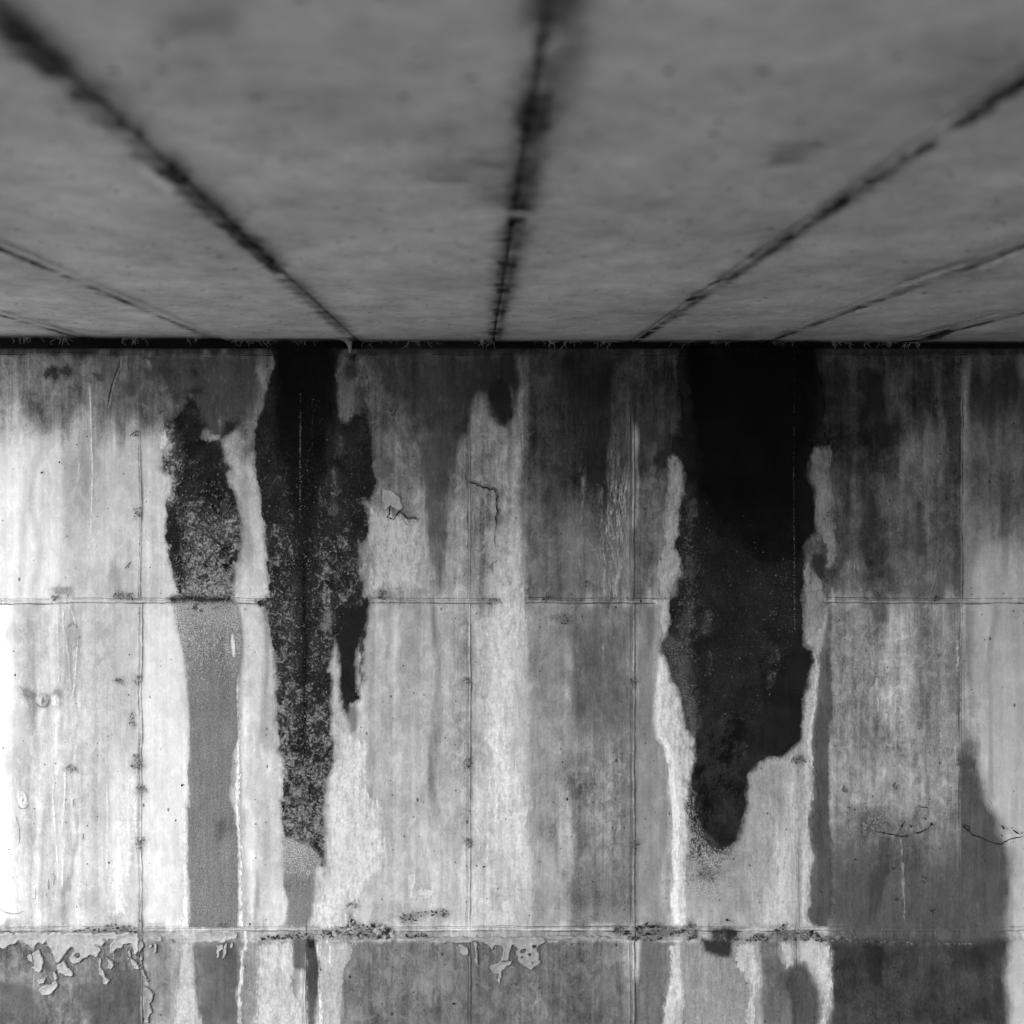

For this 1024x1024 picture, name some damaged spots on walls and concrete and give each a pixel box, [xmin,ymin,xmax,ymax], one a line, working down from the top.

leakage [838,246,1024,315]
peeling [382,489,403,510]
crack [464,472,507,583]
leakage [160,345,424,1024]
leakage [652,332,1009,1024]
crack [876,806,934,837]
crack [963,824,1023,845]
peeling [0,931,174,1023]
peeling [195,923,238,959]
peeling [431,935,610,987]